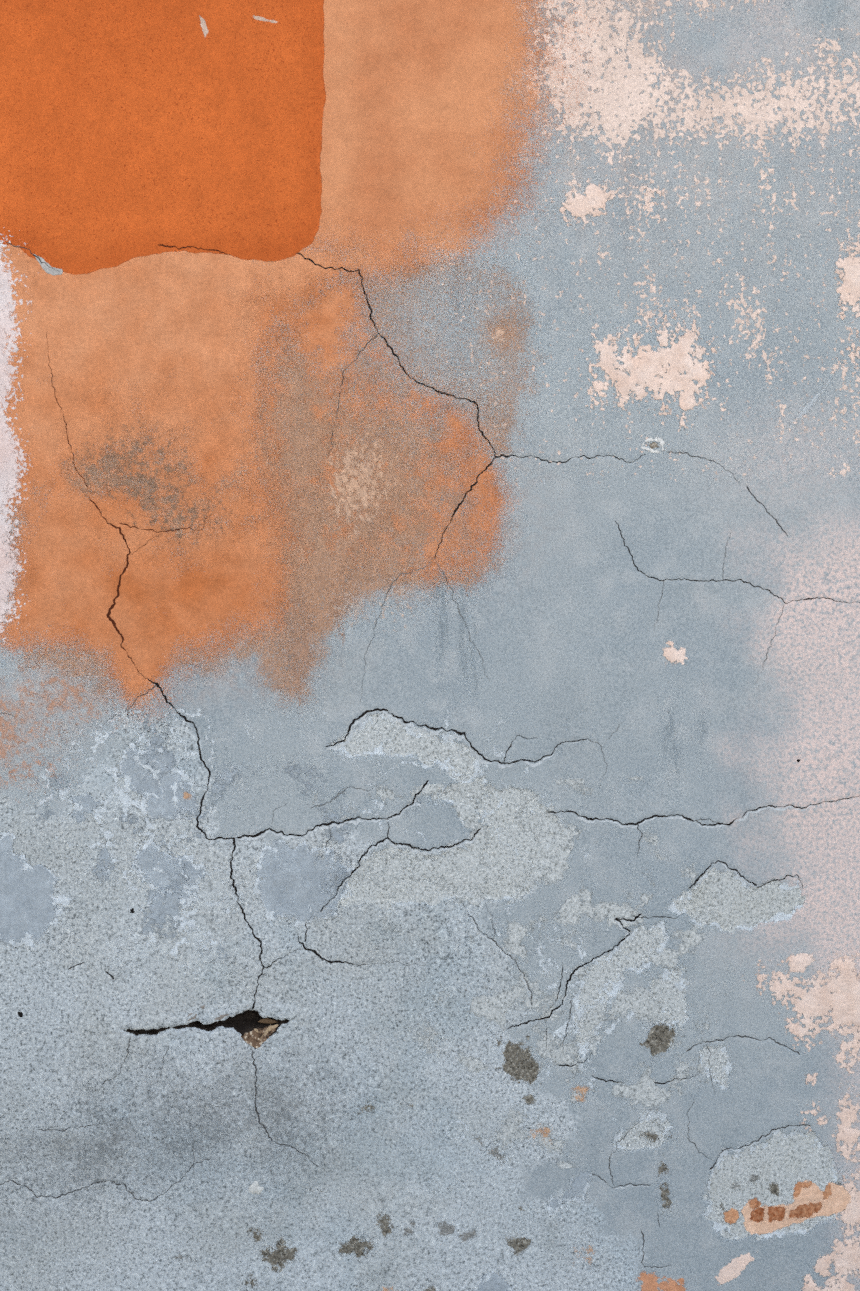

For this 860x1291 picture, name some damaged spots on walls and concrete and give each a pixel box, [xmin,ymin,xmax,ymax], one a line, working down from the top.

crack [6,242,60,272]
crack [159,244,230,255]
peeling [435,0,860,485]
crack [46,333,482,1009]
crack [296,253,788,777]
crack [615,521,860,681]
crack [548,795,860,856]
crack [462,860,803,1083]
crack [0,1048,317,1202]
crack [593,1035,810,1268]
flaking render [702,953,860,1291]